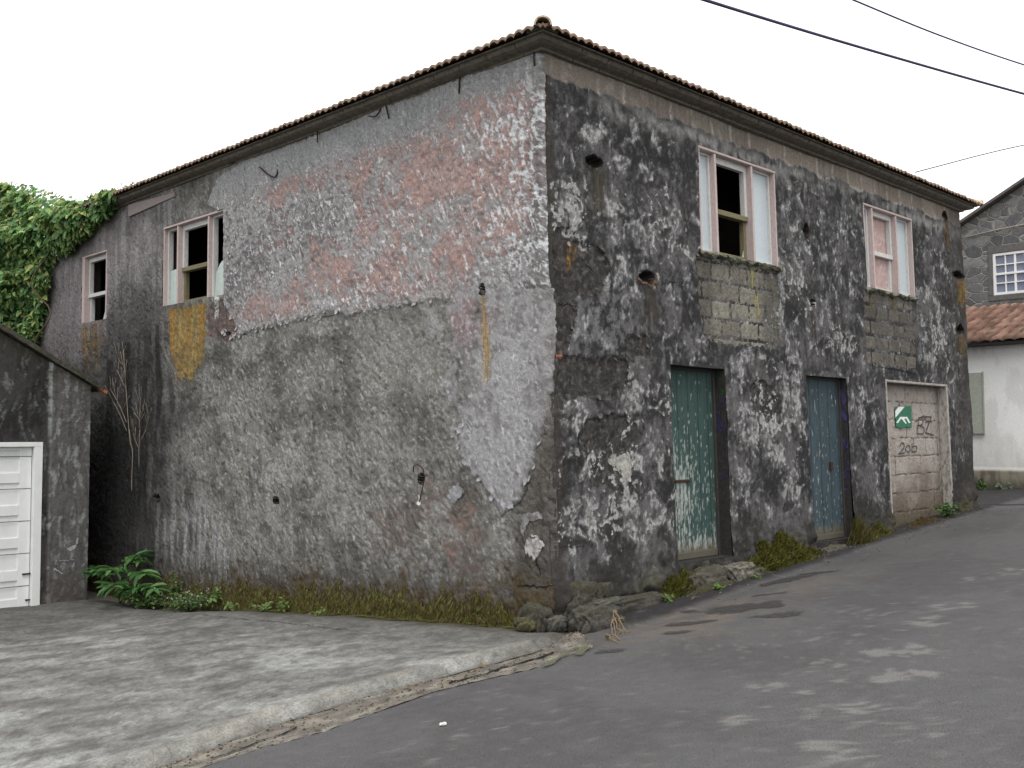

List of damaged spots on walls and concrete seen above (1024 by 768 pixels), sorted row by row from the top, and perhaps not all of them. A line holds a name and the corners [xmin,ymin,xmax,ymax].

leakage [106,325,165,547]
peeling [206,76,674,569]
rust [480,295,492,384]
spalling [629,172,965,496]